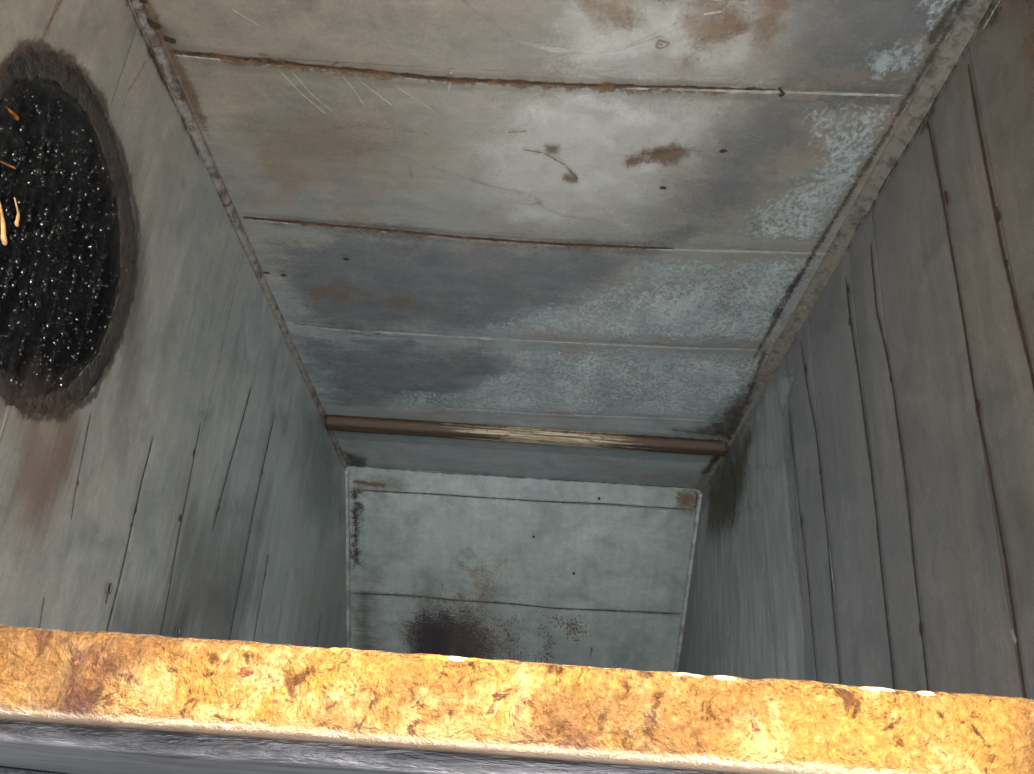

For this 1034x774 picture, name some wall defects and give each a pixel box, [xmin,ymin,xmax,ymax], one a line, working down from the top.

rust [139,0,775,124]
leakage [563,0,775,75]
leakage [866,0,954,80]
rust [523,146,577,183]
rust [627,143,703,168]
leakage [479,88,902,240]
rust [243,216,673,250]
leakage [330,249,826,680]
rust [789,415,818,681]
rust [407,586,592,663]
rust [237,667,254,678]
rust [671,672,737,681]